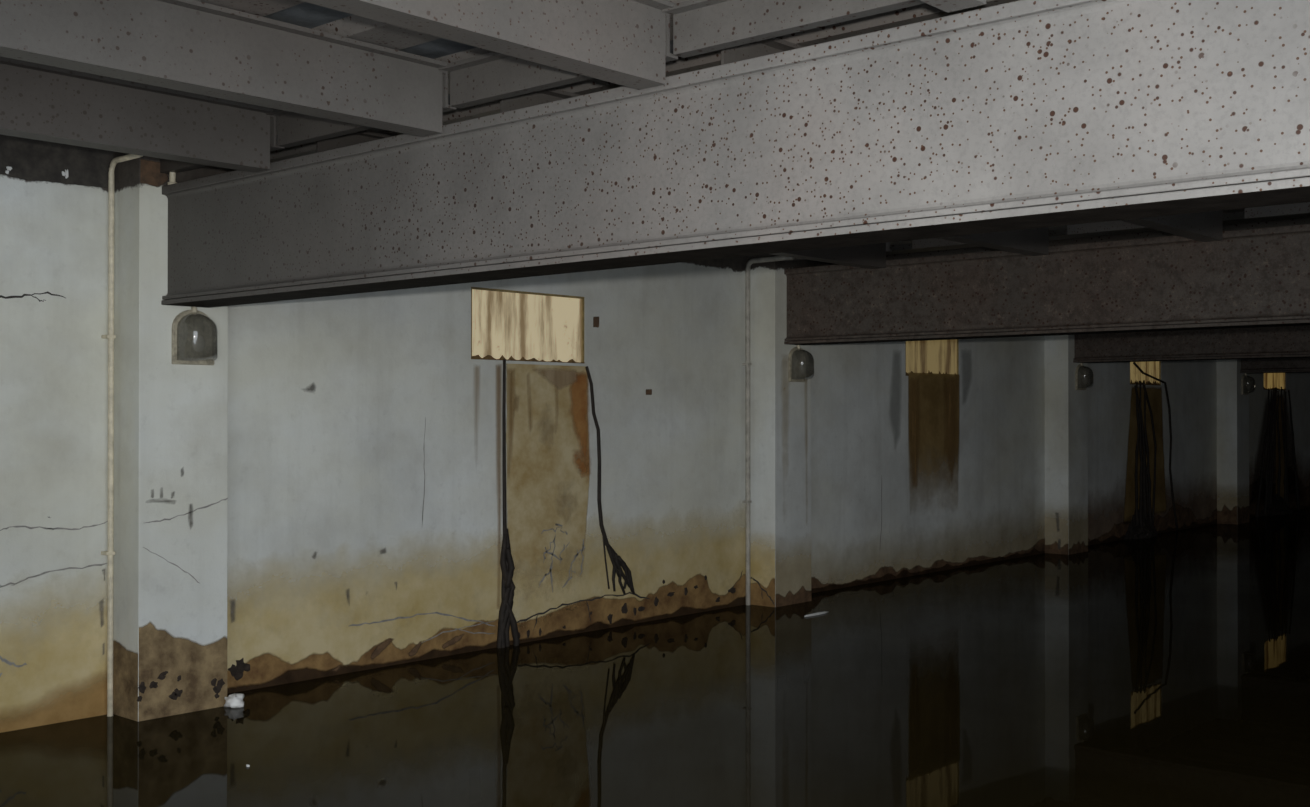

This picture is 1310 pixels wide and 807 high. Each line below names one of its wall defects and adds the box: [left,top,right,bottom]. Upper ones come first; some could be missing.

crack [0,291,65,302]
crack [0,516,107,531]
crack [143,498,228,583]
crack [0,563,107,588]
damp [0,501,1131,733]
spalling [137,671,183,702]
spalling [211,658,250,699]